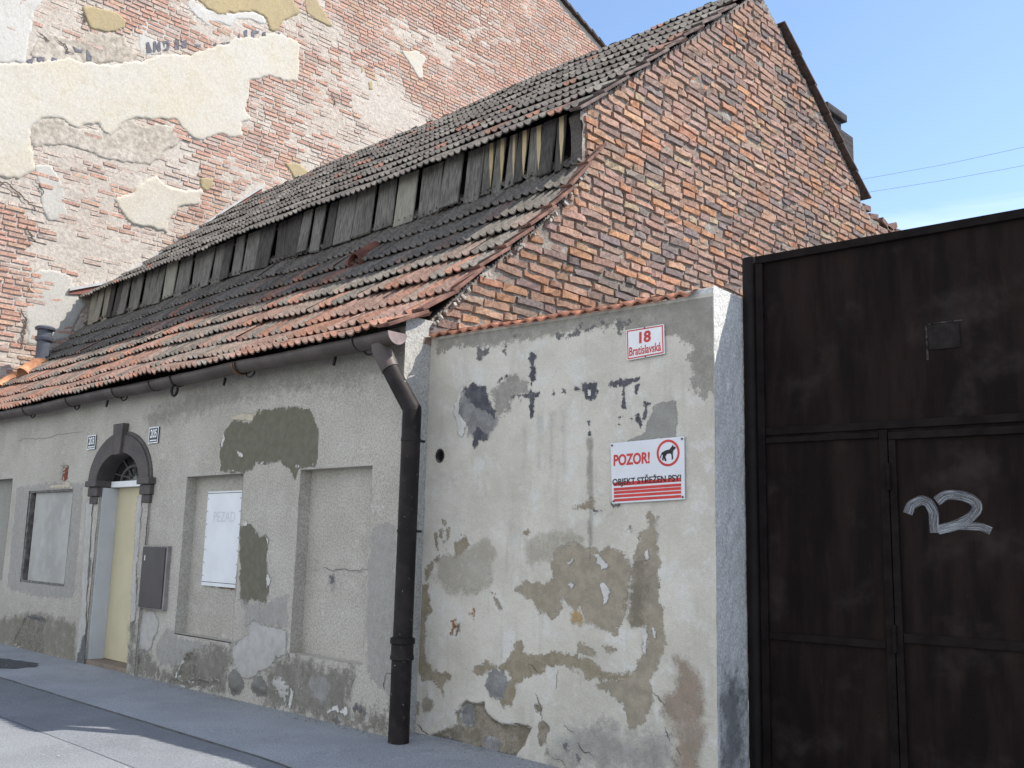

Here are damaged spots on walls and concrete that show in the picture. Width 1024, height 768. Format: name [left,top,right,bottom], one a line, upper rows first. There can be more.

flaking render [402,50,426,79]
flaking render [0,0,333,233]
flaking render [25,269,87,345]
flaking render [436,296,714,449]
flaking render [219,406,319,479]
flaking render [239,521,271,605]
spalling [168,652,221,688]
flaking render [271,673,293,708]
spalling [416,519,550,757]
peeling [465,509,667,730]